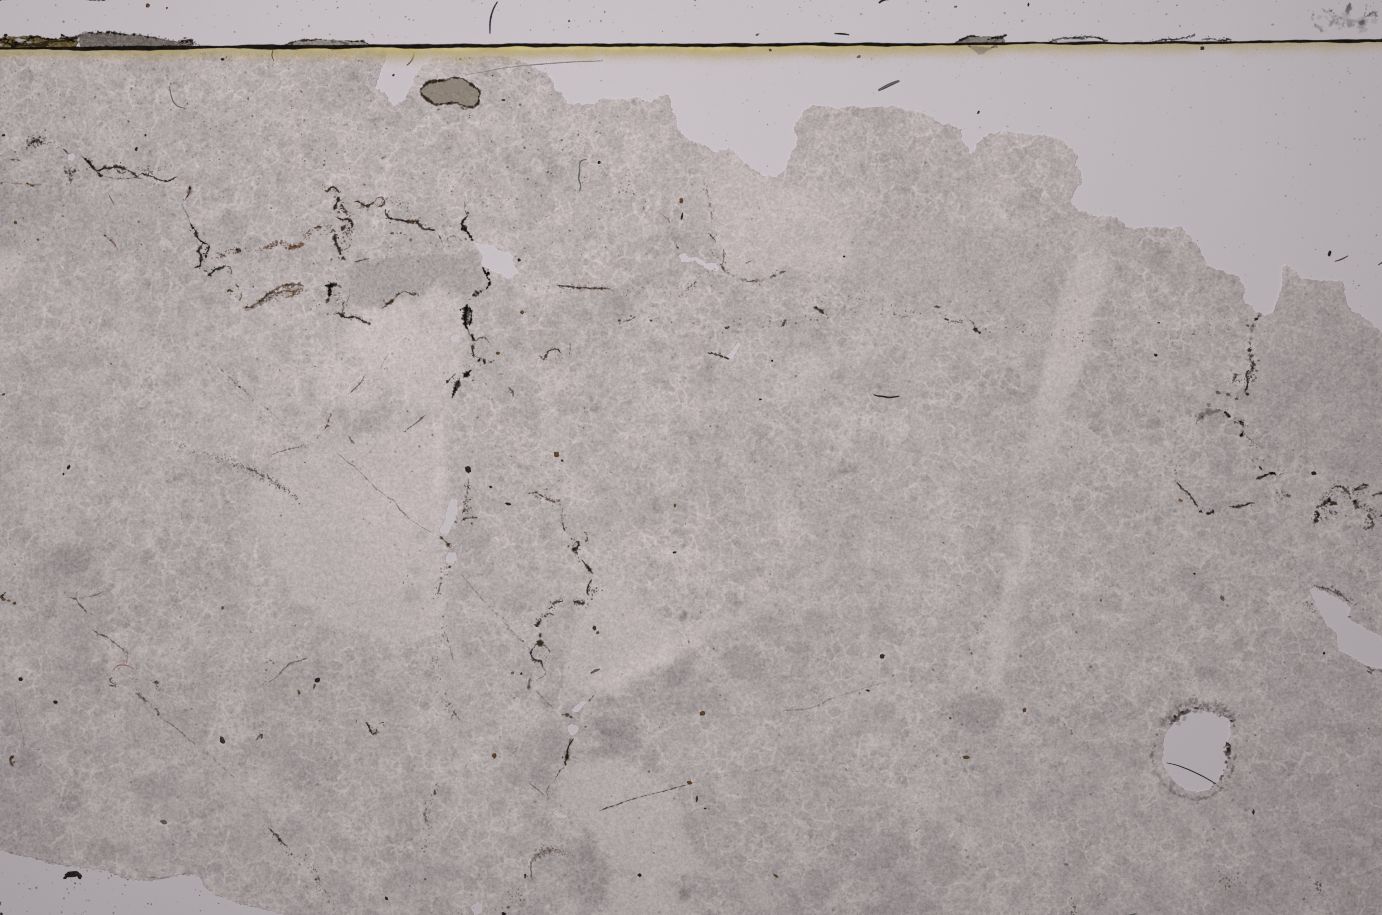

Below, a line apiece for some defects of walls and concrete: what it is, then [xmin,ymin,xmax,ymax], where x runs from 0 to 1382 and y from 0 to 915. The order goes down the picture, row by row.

crack [83,157,256,301]
crack [322,185,494,398]
crack [557,284,652,322]
crack [1176,316,1290,515]
crack [512,491,597,689]
crack [530,695,594,790]